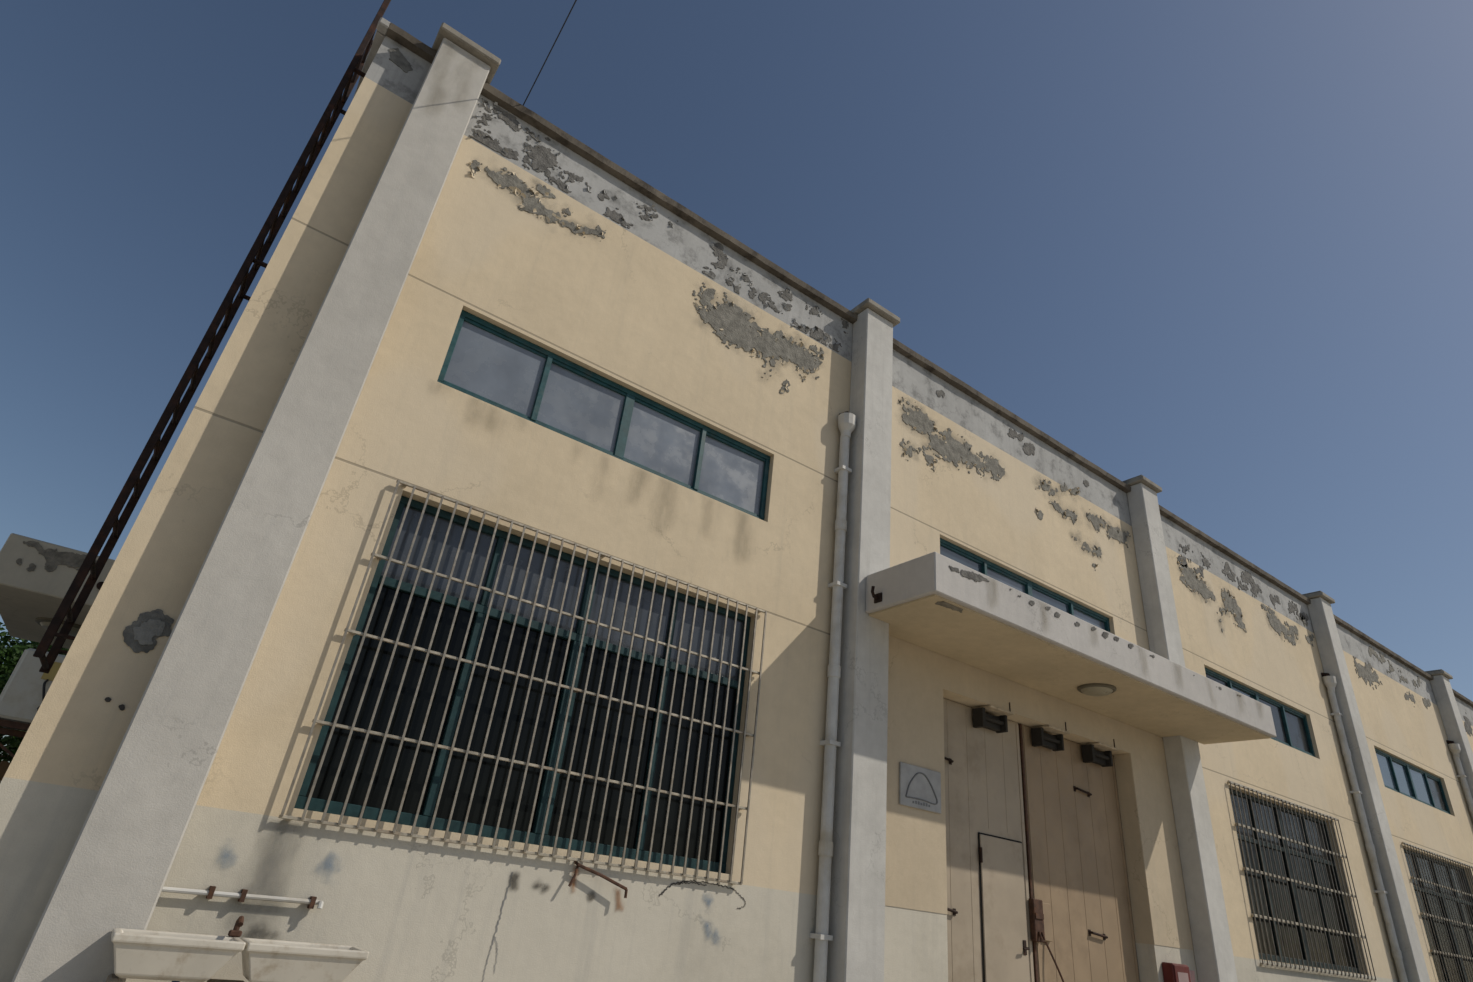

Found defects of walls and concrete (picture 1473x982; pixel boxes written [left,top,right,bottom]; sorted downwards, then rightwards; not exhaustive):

peeling [467,98,678,239]
peeling [693,242,849,396]
peeling [898,397,1005,481]
peeling [1007,428,1035,456]
spalling [16,541,111,572]
peeling [123,609,174,653]
peeling [1177,544,1314,647]